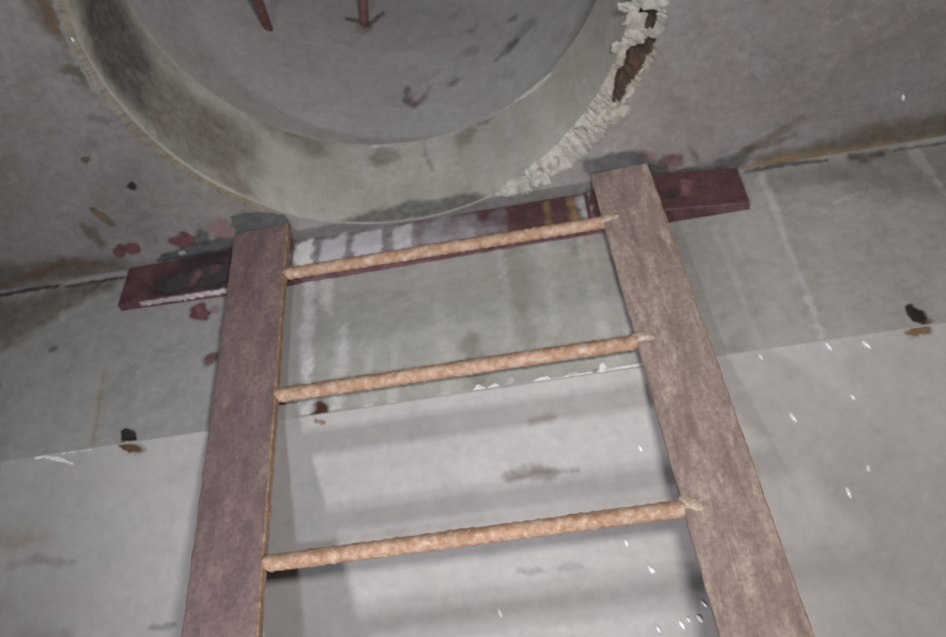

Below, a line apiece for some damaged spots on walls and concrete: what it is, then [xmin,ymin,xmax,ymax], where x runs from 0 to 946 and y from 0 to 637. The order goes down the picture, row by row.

spalling [494,0,670,197]
corrosion [119,444,141,453]